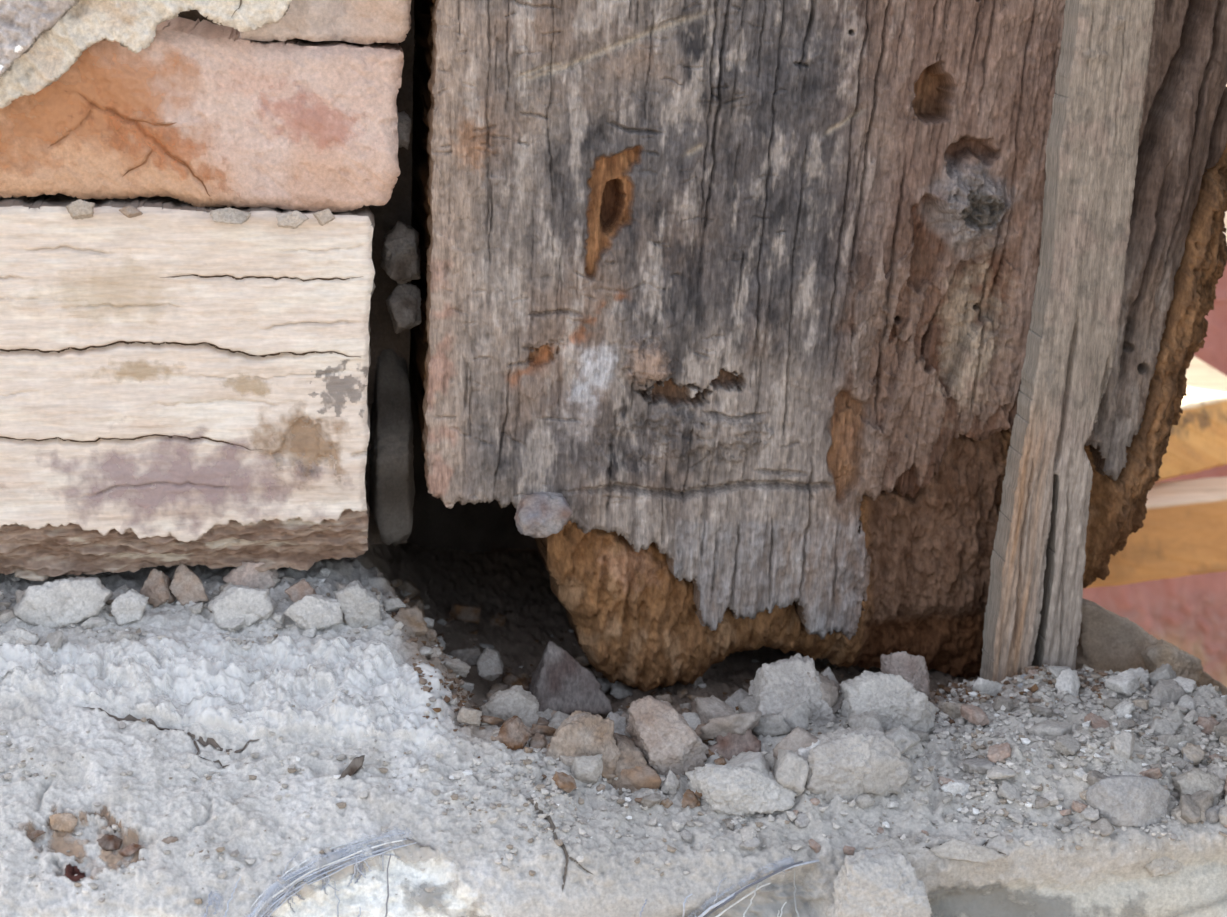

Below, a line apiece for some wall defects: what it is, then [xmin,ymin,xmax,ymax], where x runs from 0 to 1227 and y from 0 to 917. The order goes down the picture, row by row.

flaking render [0,0,292,108]
crack [48,90,210,196]
crack [160,274,363,282]
crack [0,341,359,357]
crack [0,434,263,450]
crack [83,707,260,768]